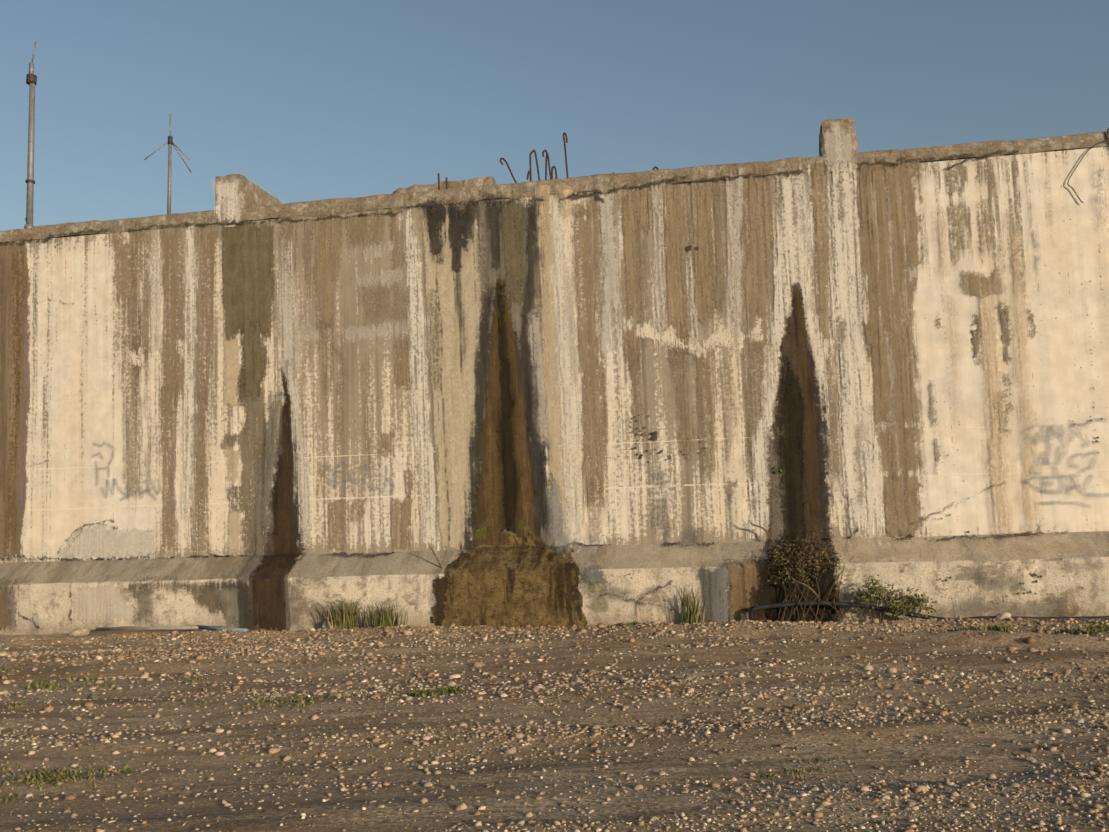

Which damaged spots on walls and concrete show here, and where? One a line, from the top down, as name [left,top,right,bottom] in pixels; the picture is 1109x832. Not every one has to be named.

damp [0,579,19,631]
damp [198,180,310,631]
damp [398,194,606,626]
damp [595,122,889,623]